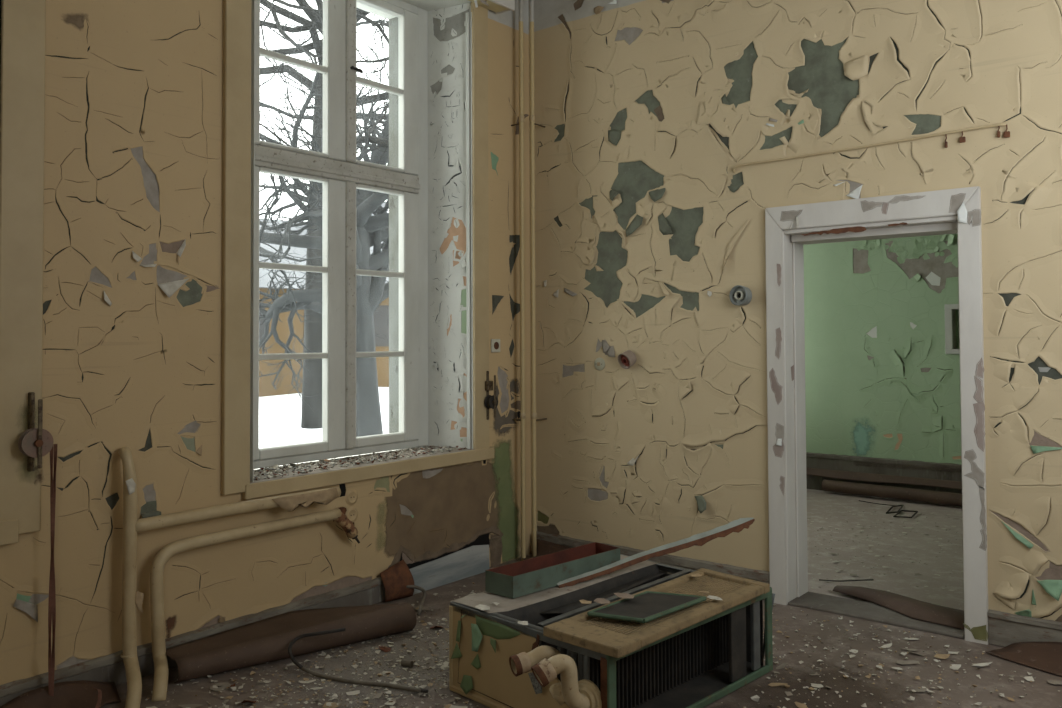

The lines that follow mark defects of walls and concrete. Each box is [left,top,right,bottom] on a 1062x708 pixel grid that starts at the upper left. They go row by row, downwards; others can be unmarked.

crack [41,10,219,655]
peeling [132,234,222,317]
peeling [436,213,466,337]
crack [428,3,561,436]
peeling [544,82,714,325]
peeling [700,26,885,199]
crack [558,0,1062,621]
peeling [780,177,981,295]
peeling [897,107,951,144]
peeling [1024,349,1062,389]
crack [486,492,497,521]
peeling [949,358,1062,622]